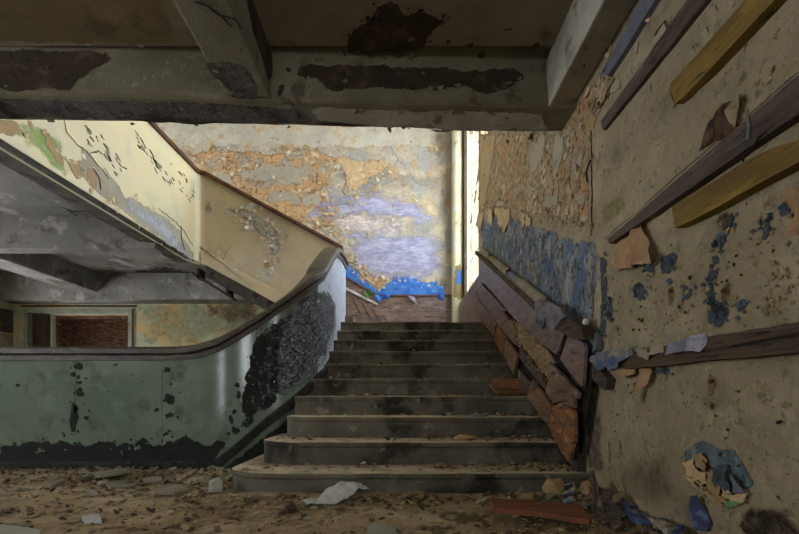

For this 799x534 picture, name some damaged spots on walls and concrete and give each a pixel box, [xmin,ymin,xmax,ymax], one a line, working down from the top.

peeling [286,1,524,95]
crack [64,120,109,190]
flaking render [0,46,797,355]
spalling [63,363,91,435]
spalling [154,383,181,419]
water stain [0,430,225,461]
water stain [228,414,295,469]
peeling [682,441,754,511]